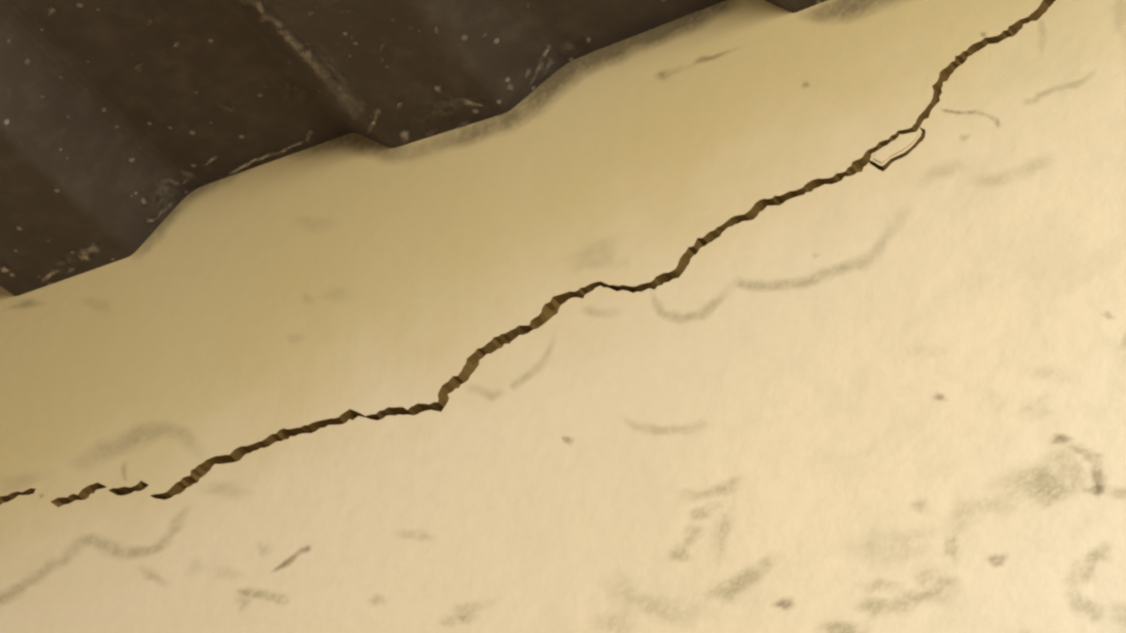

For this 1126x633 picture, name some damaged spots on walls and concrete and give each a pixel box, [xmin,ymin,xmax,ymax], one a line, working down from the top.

crack [0,0,1056,507]